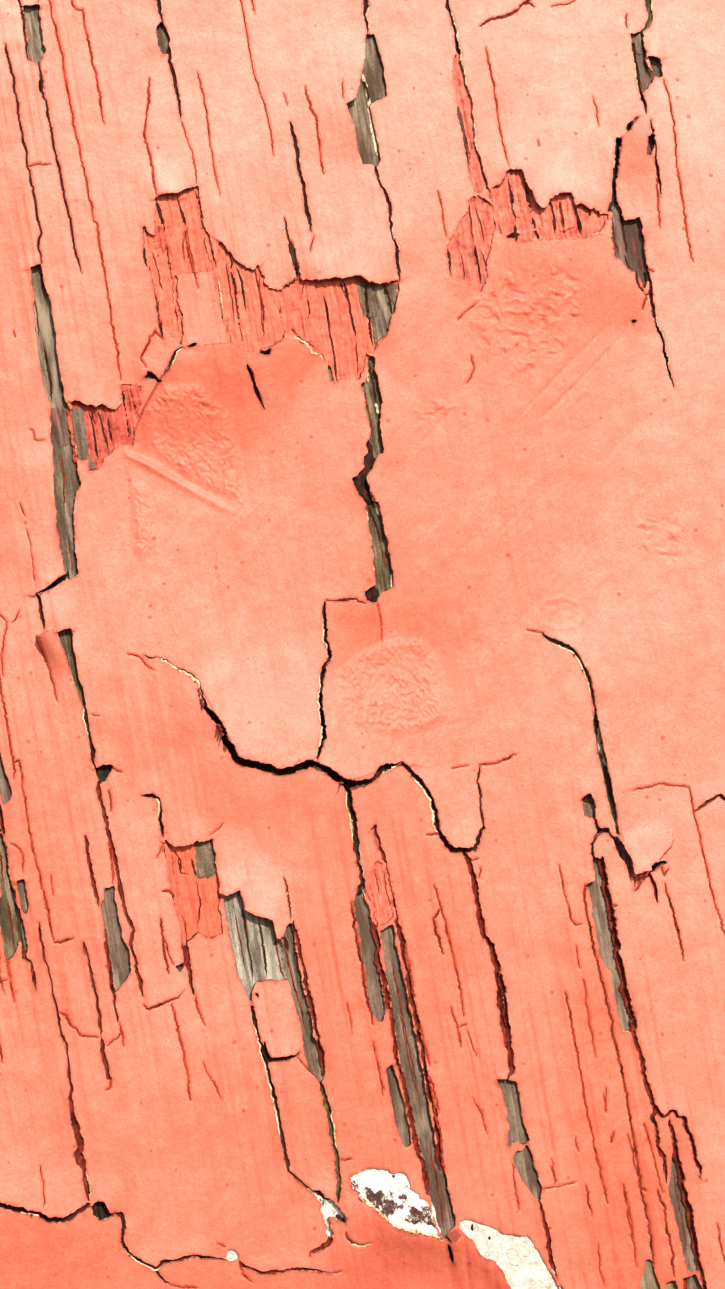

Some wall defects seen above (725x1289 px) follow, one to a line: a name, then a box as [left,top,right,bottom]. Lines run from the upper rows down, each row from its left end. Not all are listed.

peeling [347,35,386,166]
peeling [447,52,658,291]
peeling [31,265,161,714]
peeling [143,156,399,602]
crack [526,629,596,711]
crack [0,504,372,1289]
peeling [164,826,324,1081]
crack [127,598,517,1194]
peeling [350,825,562,1289]
peeling [582,711,672,1031]
peeling [640,1156,702,1289]